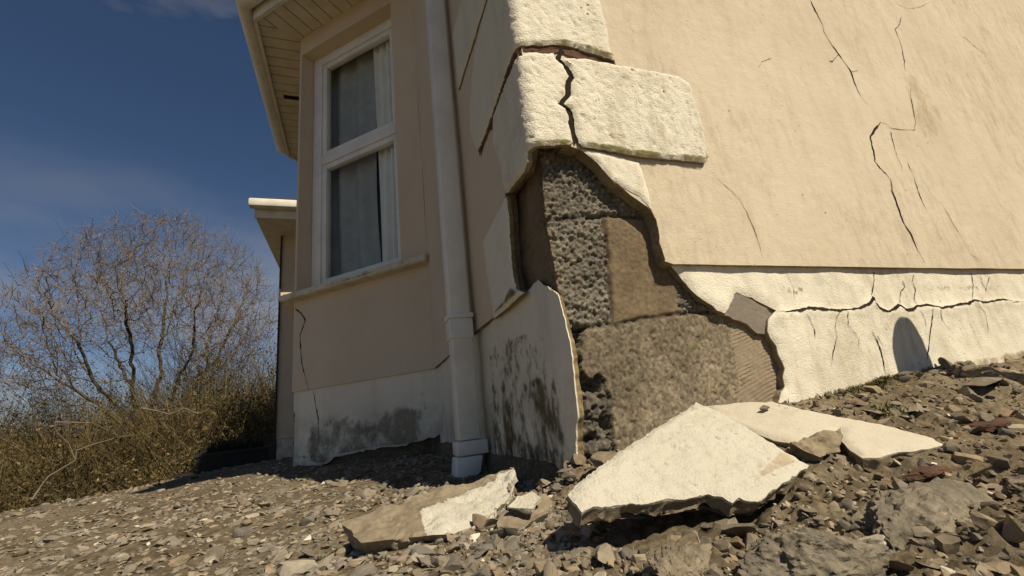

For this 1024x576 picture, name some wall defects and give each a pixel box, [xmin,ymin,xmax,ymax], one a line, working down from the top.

crack [555,48,577,143]
crack [782,2,1021,377]
spalling [516,148,779,460]
crack [293,308,319,436]
water stain [304,409,417,463]
water stain [492,379,563,467]